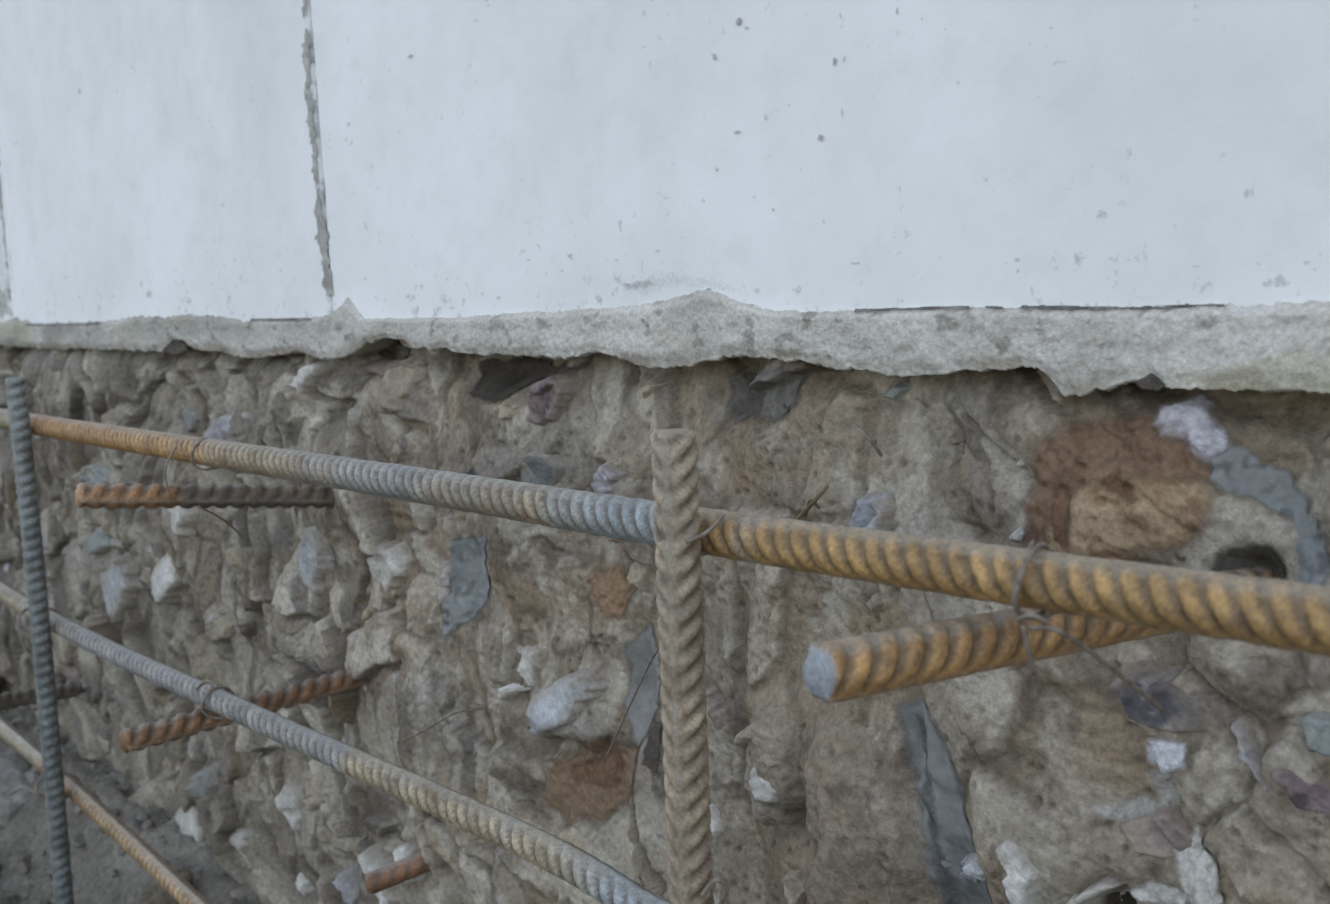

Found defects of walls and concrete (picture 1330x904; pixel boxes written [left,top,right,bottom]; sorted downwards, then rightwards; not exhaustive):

spalling [162,339,188,355]
spalling [368,339,428,415]
spalling [469,356,589,403]
spalling [727,367,805,424]
spalling [1135,373,1165,390]
rust [1022,414,1213,561]
spalling [0,377,1330,904]